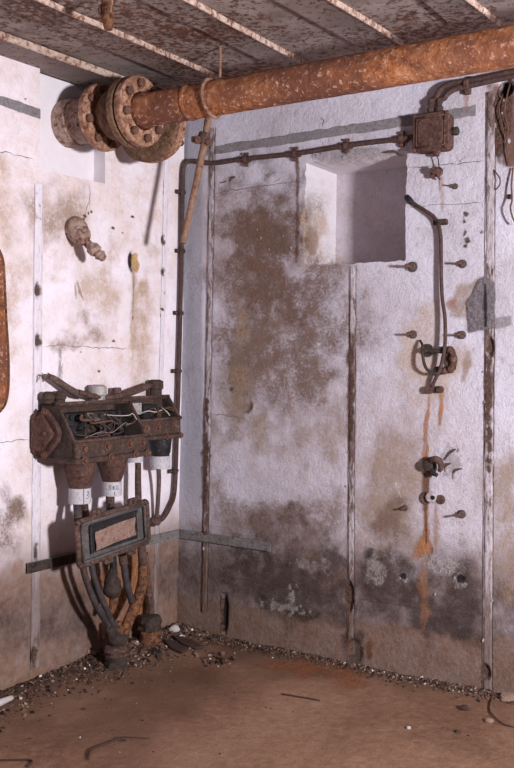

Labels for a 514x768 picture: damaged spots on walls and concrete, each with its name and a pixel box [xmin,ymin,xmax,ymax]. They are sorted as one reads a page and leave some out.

damp [214,185,342,432]
damp [220,498,348,623]
damp [363,436,422,547]
damp [360,548,479,641]
rust [413,504,437,558]